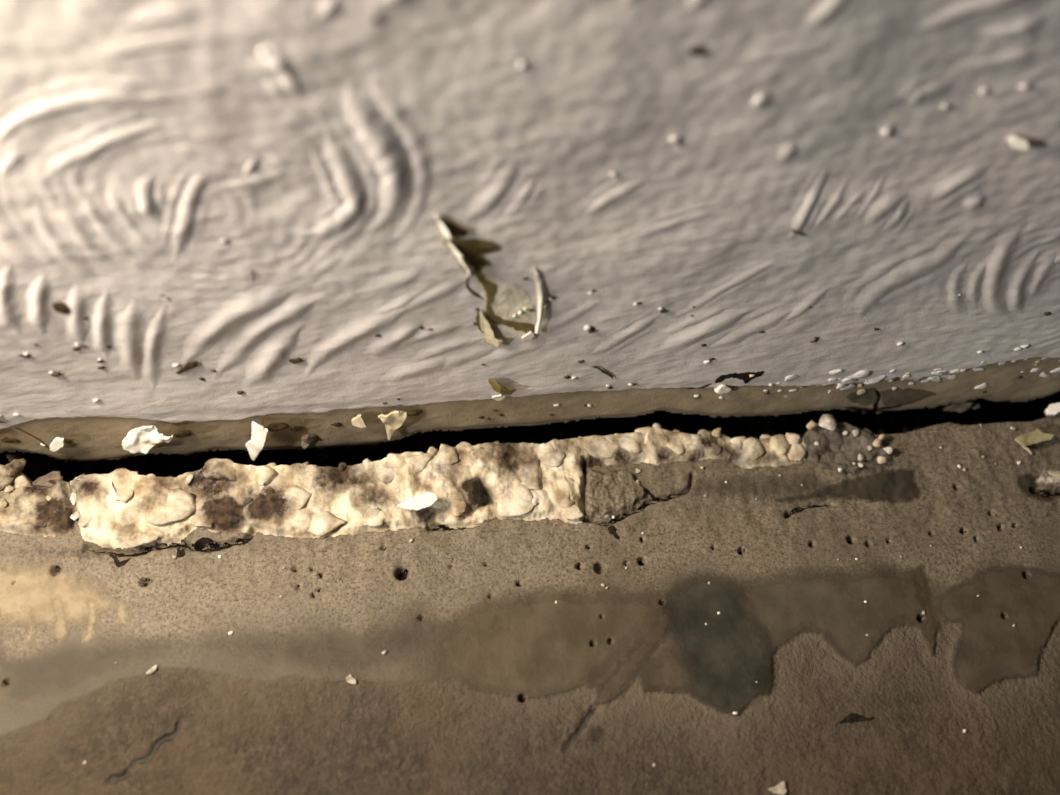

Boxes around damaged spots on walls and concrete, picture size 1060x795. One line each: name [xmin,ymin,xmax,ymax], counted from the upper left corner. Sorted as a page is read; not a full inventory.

peeling [434,215,556,347]
crack [0,389,1060,486]
spalling [0,357,1060,551]
leakage [440,566,1060,713]
crack [108,717,194,784]